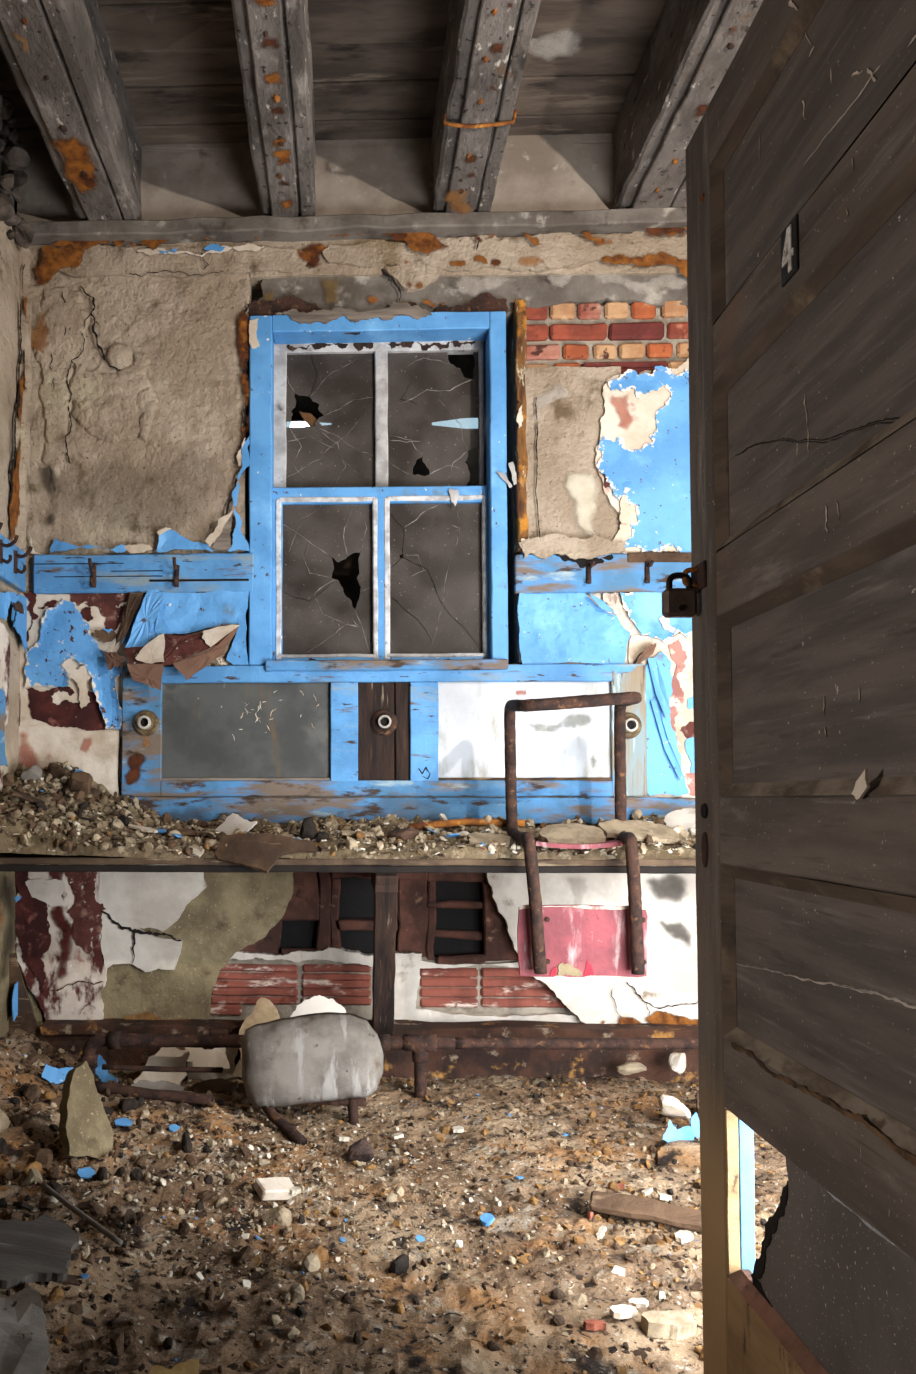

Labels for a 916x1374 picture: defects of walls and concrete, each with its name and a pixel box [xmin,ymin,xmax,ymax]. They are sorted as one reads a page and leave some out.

rust [53,138,96,192]
crack [0,252,120,504]
spalling [29,231,691,554]
crack [735,416,902,456]
peeling [0,589,249,796]
peeling [517,592,695,798]
crack [736,963,916,1009]